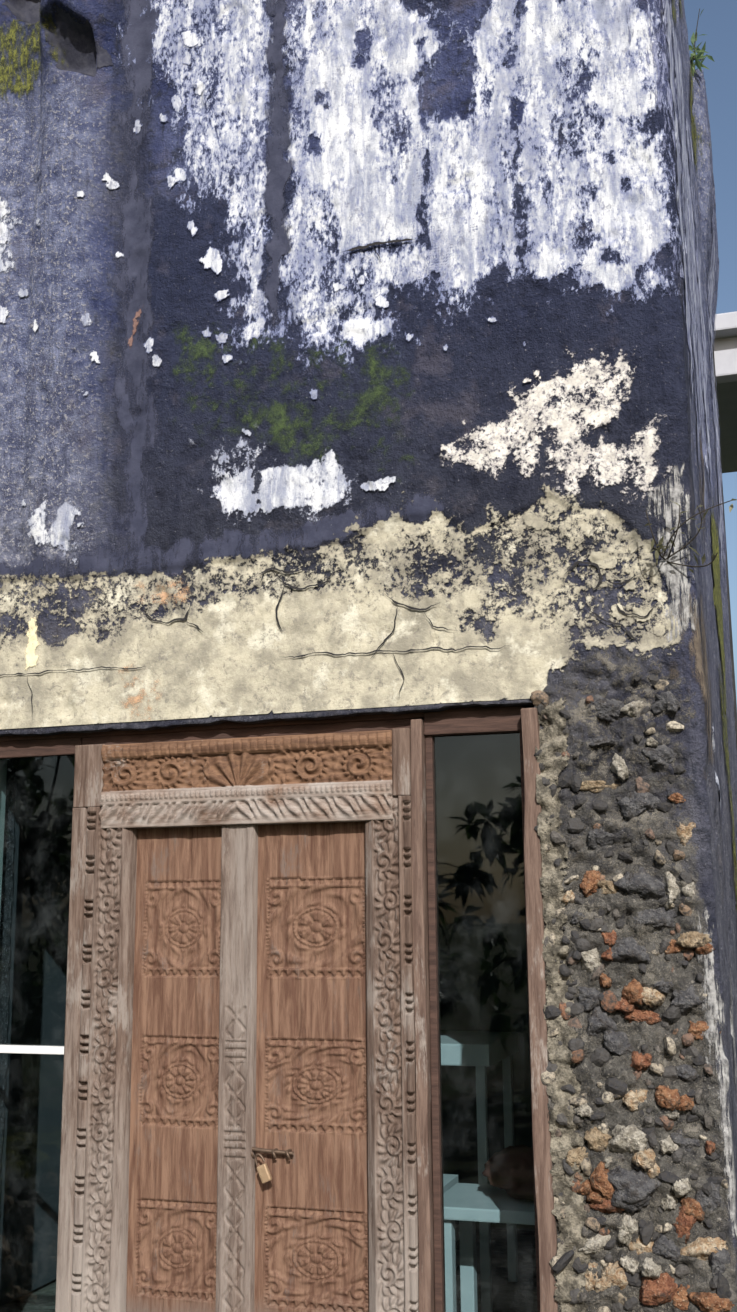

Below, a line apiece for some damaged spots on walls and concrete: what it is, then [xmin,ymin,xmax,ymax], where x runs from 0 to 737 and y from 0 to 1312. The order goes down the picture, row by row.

peeling [0,305,9,323]
peeling [0,196,40,274]
leakage [0,0,445,584]
peeling [42,0,696,404]
crack [0,666,144,720]
crack [140,603,203,632]
crack [259,567,512,696]
flaking render [0,346,685,1312]